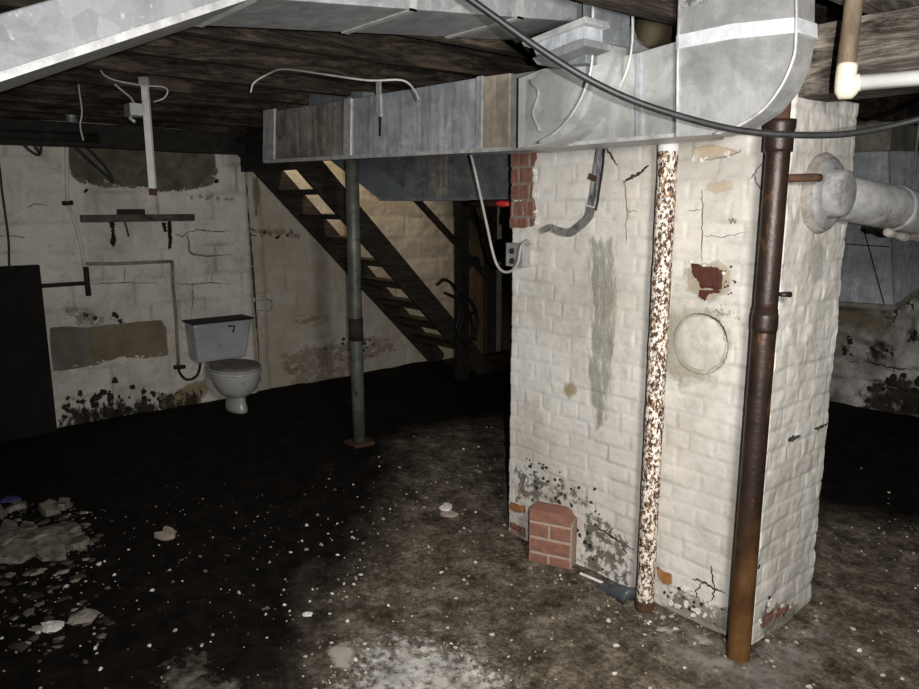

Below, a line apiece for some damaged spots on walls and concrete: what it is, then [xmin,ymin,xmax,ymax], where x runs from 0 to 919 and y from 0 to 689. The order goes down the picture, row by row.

flaking render [510,153,539,229]
flaking render [687,260,740,320]
damp [588,237,617,427]
damp [58,377,208,427]
damp [858,373,919,417]
damp [512,458,632,586]
corrosion [656,566,672,585]
crack [694,566,725,601]